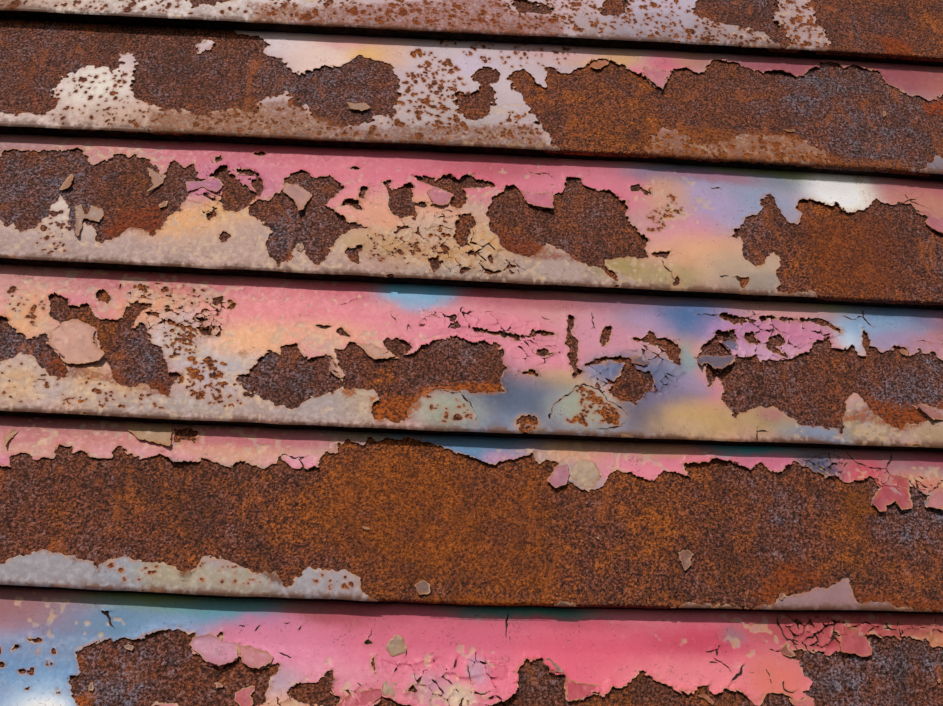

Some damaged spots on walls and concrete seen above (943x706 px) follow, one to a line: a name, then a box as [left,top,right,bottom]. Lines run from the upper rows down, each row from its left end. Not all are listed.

peeling [0,19,401,128]
peeling [455,0,943,176]
rust [644,128,907,171]
peeling [0,148,368,267]
crack [394,210,520,277]
peeling [731,194,943,305]
peeling [238,325,507,423]
crack [392,307,560,363]
crack [548,339,680,430]
rust [845,400,922,429]
peeling [0,421,943,612]
crack [706,615,942,693]